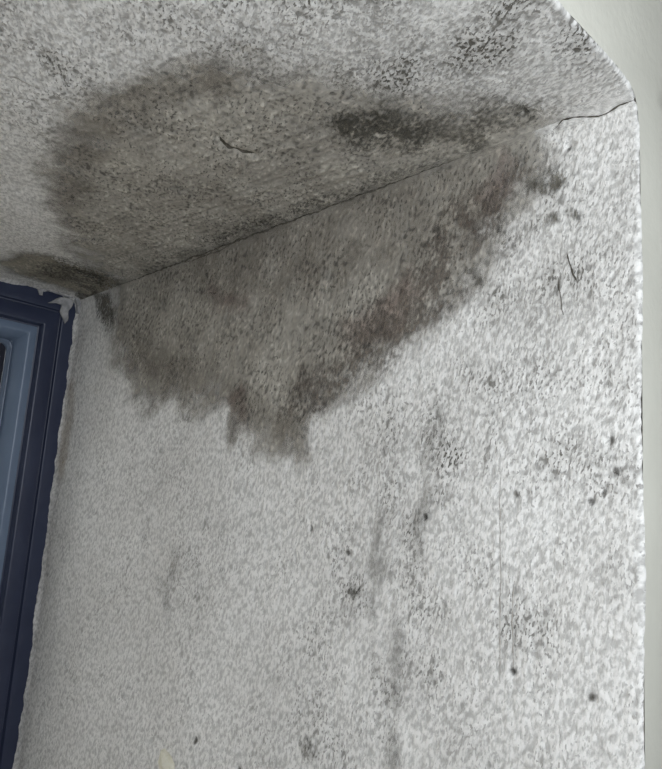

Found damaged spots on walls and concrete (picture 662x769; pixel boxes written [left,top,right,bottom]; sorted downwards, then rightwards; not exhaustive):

damp [0,66,566,458]
crack [553,99,635,130]